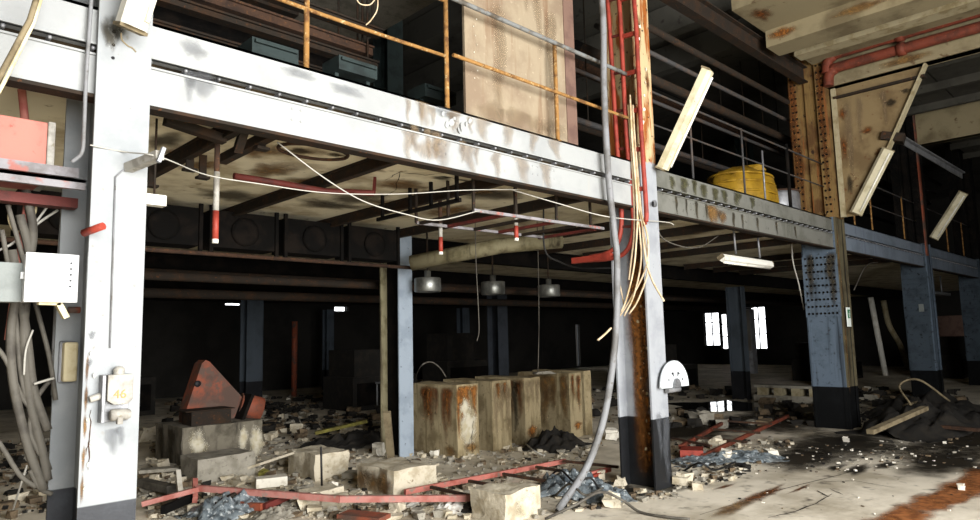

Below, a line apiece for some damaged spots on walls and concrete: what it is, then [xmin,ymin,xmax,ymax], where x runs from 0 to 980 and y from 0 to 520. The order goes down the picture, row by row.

corrosion [789,81,804,203]
leakage [307,181,429,208]
leakage [468,190,513,199]
leakage [670,177,759,230]
corrosion [629,237,649,456]
corrosion [421,386,477,433]
corrosion [496,380,522,424]
corrosion [534,376,580,414]
leakage [669,390,980,475]
corrosion [872,466,980,520]